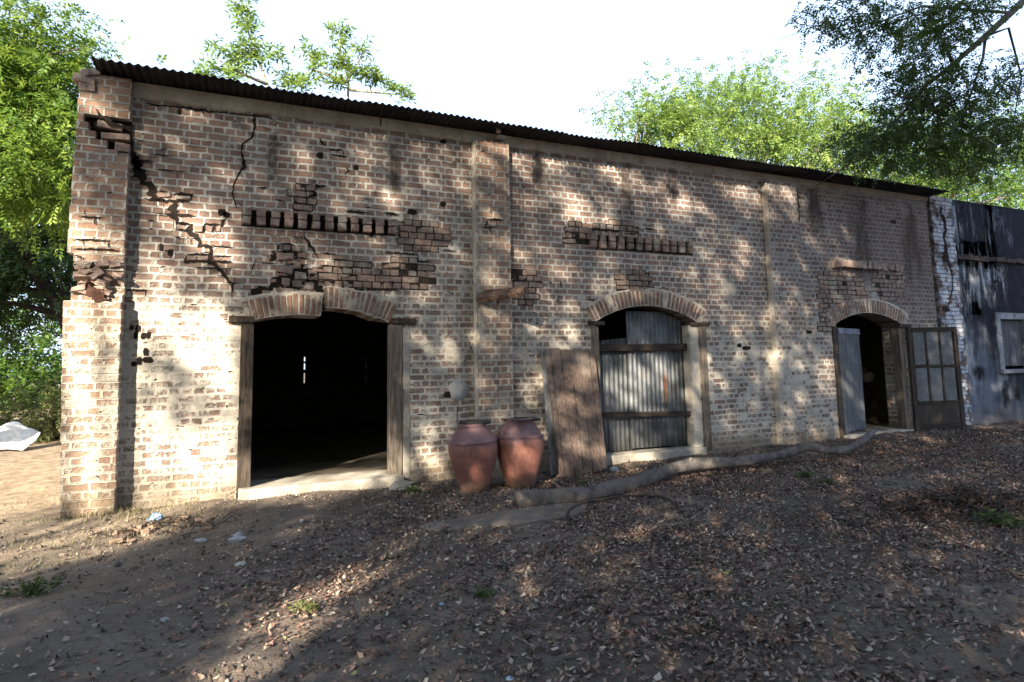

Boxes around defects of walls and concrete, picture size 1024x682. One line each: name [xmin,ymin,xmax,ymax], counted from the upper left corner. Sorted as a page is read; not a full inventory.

spalling [71,260,124,302]
crack [96,103,453,313]